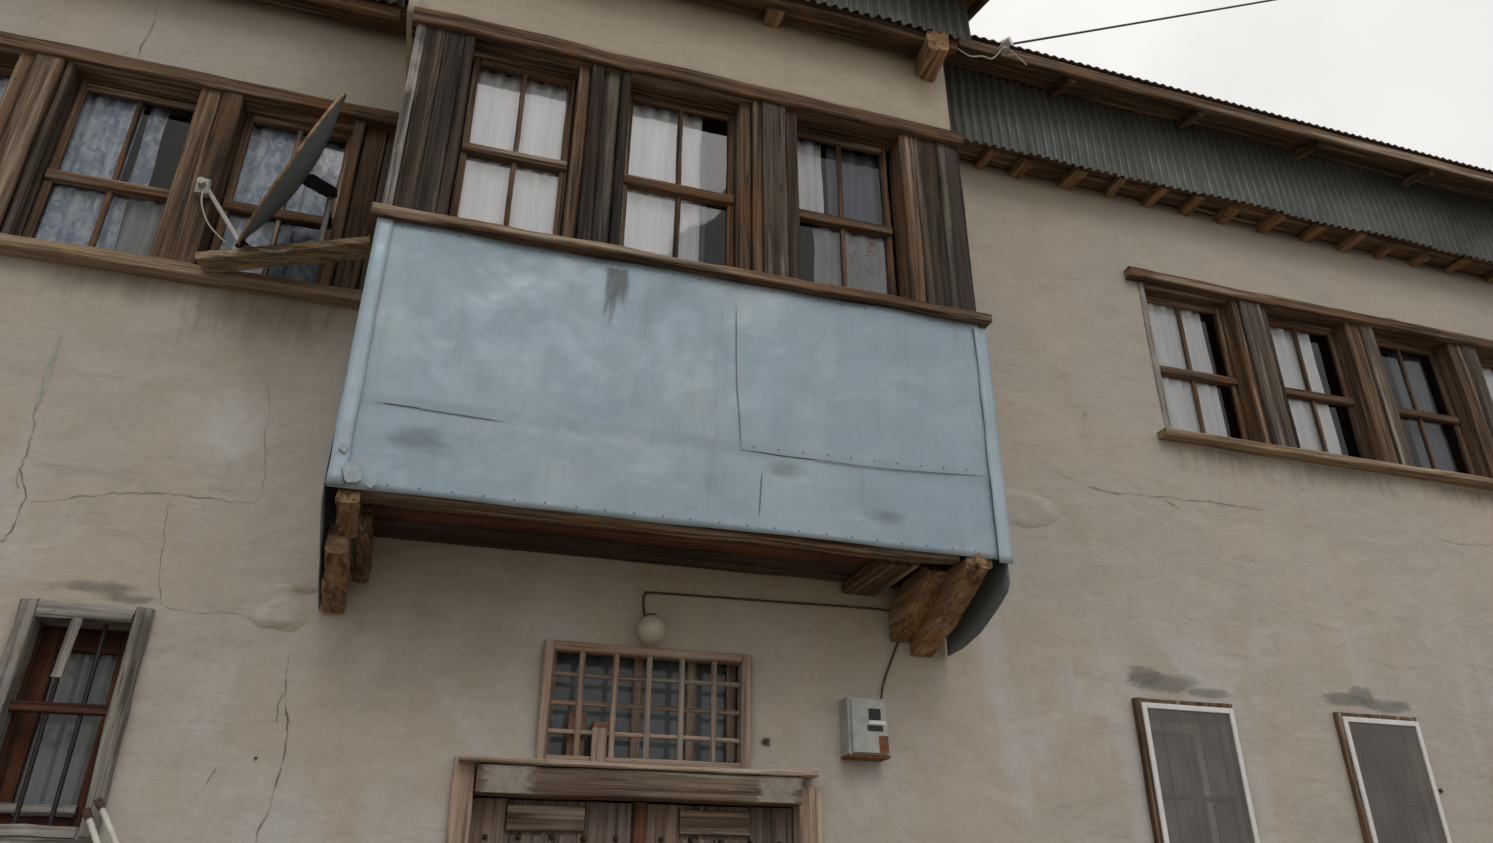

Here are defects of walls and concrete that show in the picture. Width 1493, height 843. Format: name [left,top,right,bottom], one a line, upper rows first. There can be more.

crack [0,359,270,618]
crack [255,670,289,843]